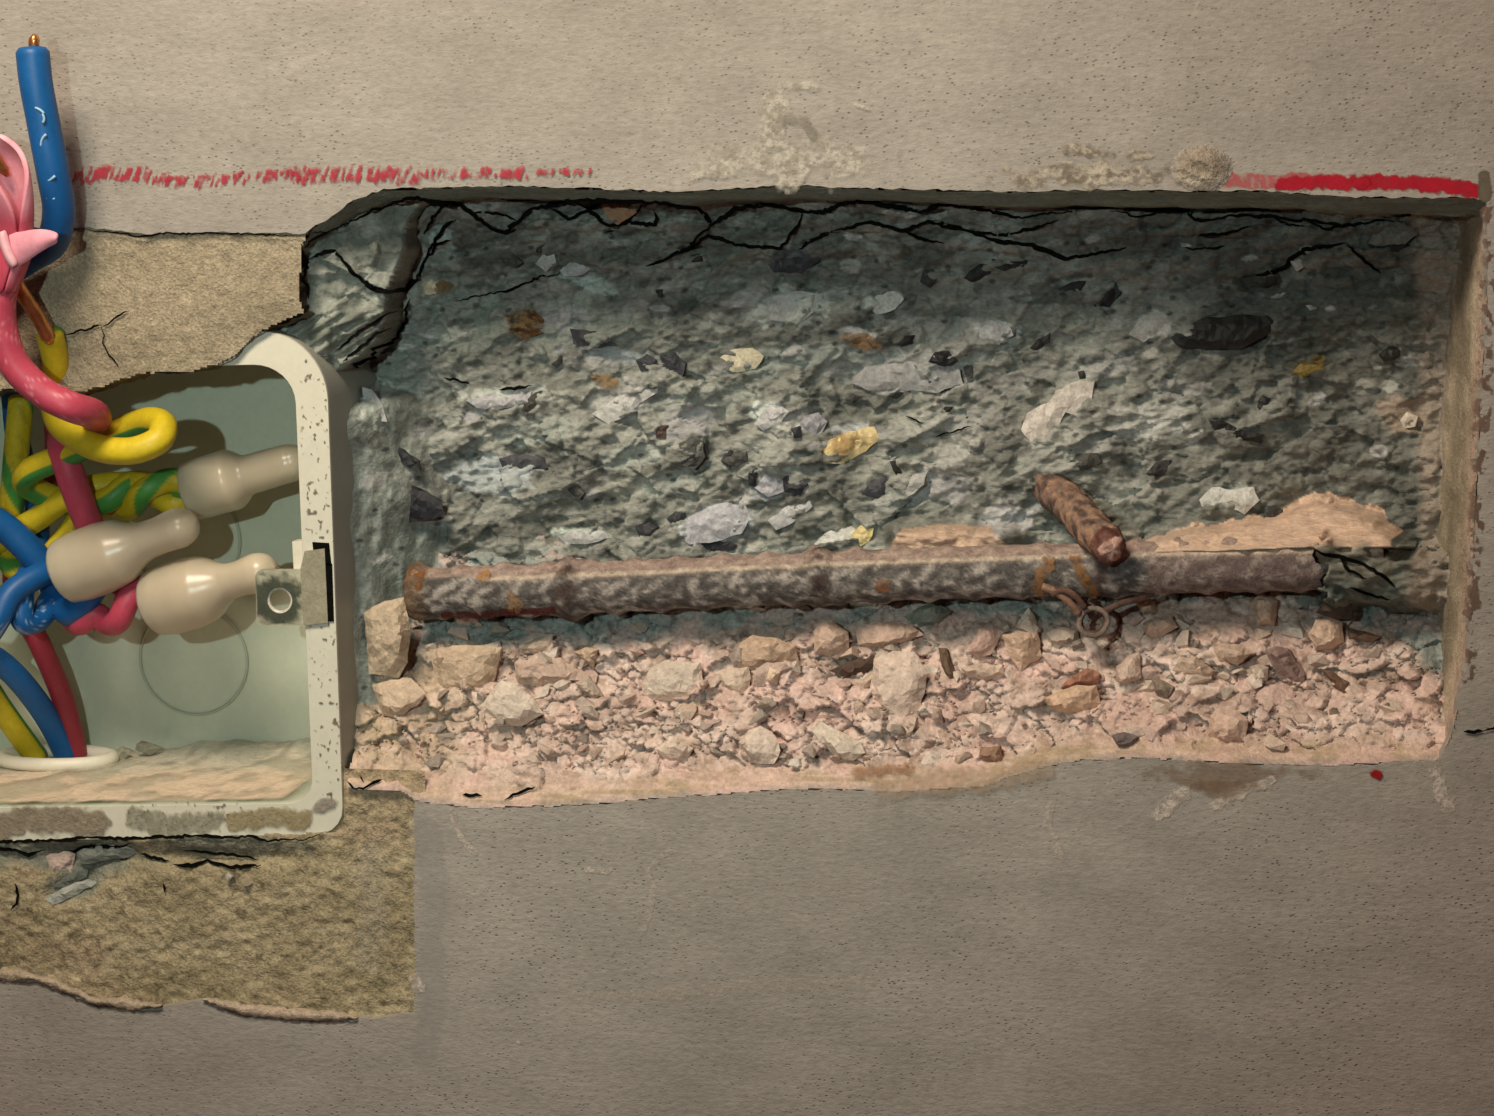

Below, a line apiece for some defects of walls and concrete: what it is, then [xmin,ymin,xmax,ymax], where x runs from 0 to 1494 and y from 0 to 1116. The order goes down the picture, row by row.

crack [87,196,1403,368]
spalling [0,161,1487,1023]
crack [1312,548,1395,600]
crack [0,831,326,909]